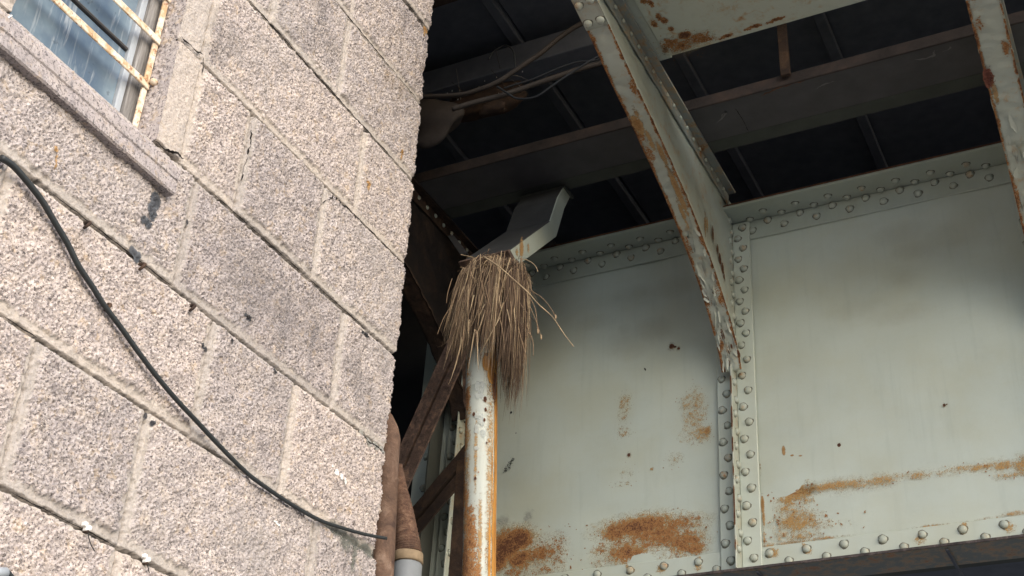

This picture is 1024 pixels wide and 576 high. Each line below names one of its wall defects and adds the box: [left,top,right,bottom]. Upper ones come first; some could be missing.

rust [587,24,742,393]
rust [640,0,785,62]
peeling [687,217,740,372]
rust [966,0,1024,234]
rust [462,345,712,576]
rust [761,456,1024,557]